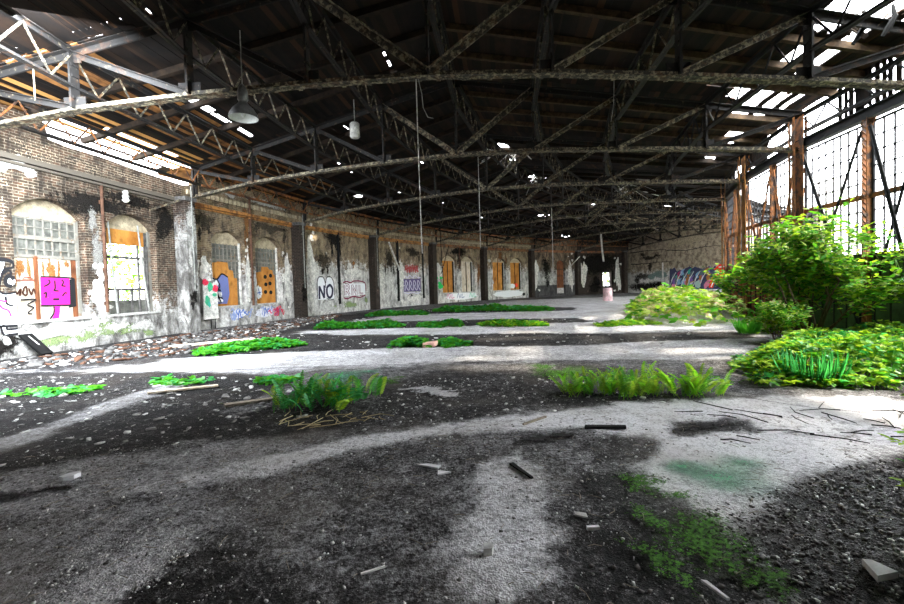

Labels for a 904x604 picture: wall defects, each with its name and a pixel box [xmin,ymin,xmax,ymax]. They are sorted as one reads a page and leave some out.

flaking render [197,256,212,281]
damp [316,233,343,275]